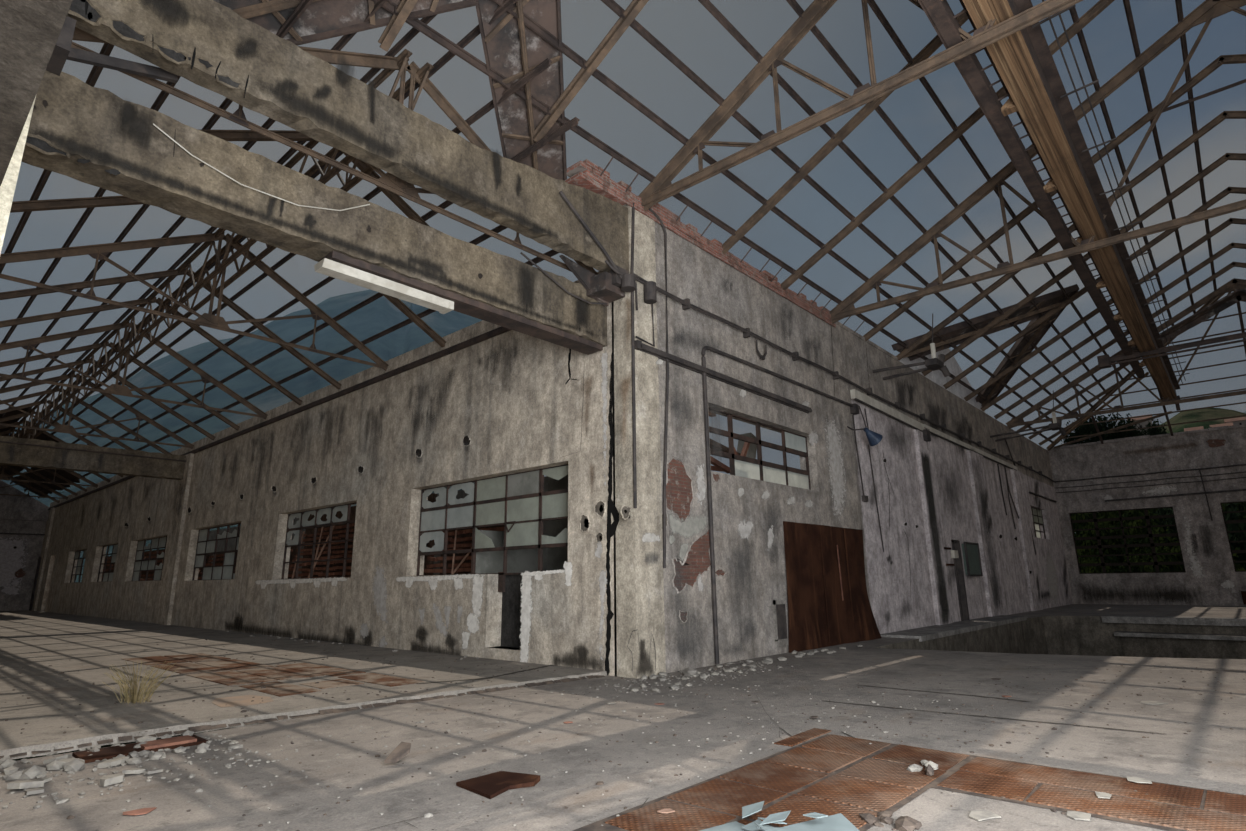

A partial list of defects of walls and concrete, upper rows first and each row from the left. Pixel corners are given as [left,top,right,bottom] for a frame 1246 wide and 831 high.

leakage [143,0,190,23]
leakage [236,40,256,57]
flaking render [565,159,836,327]
crack [560,349,656,675]
spalling [662,456,726,594]
leakage [225,615,372,646]
leakage [412,627,460,656]